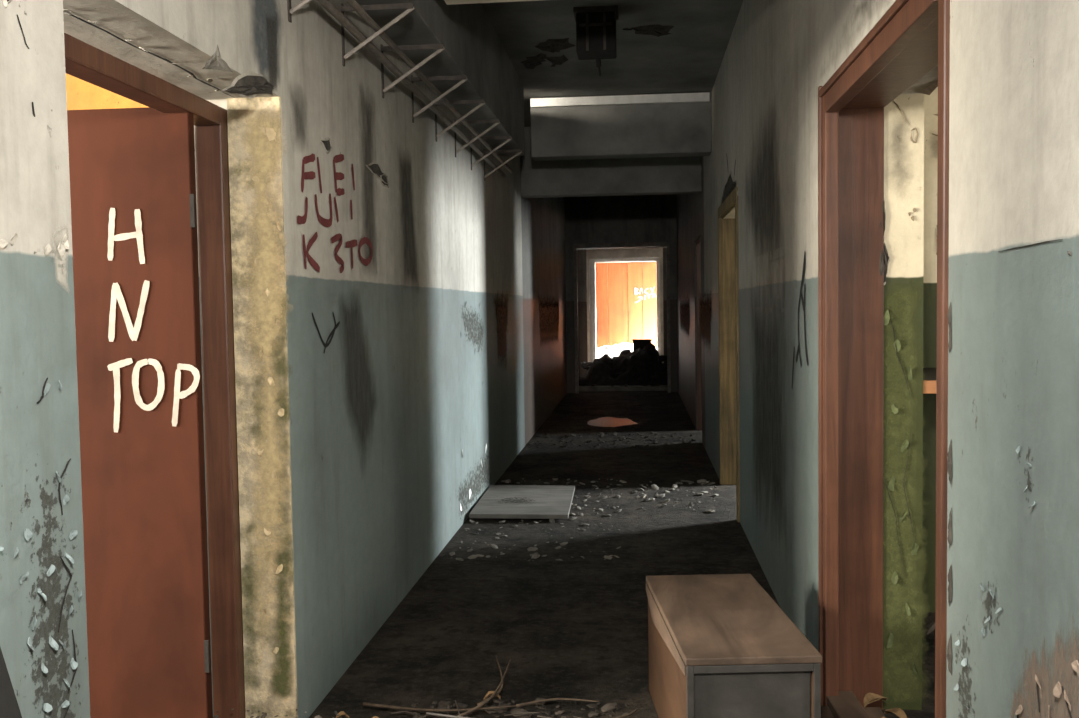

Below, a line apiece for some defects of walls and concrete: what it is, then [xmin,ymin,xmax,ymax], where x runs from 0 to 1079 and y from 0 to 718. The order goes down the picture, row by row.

crack [2,0,29,49]
crack [893,100,938,143]
peeling [980,582,1001,637]
peeling [947,619,976,718]